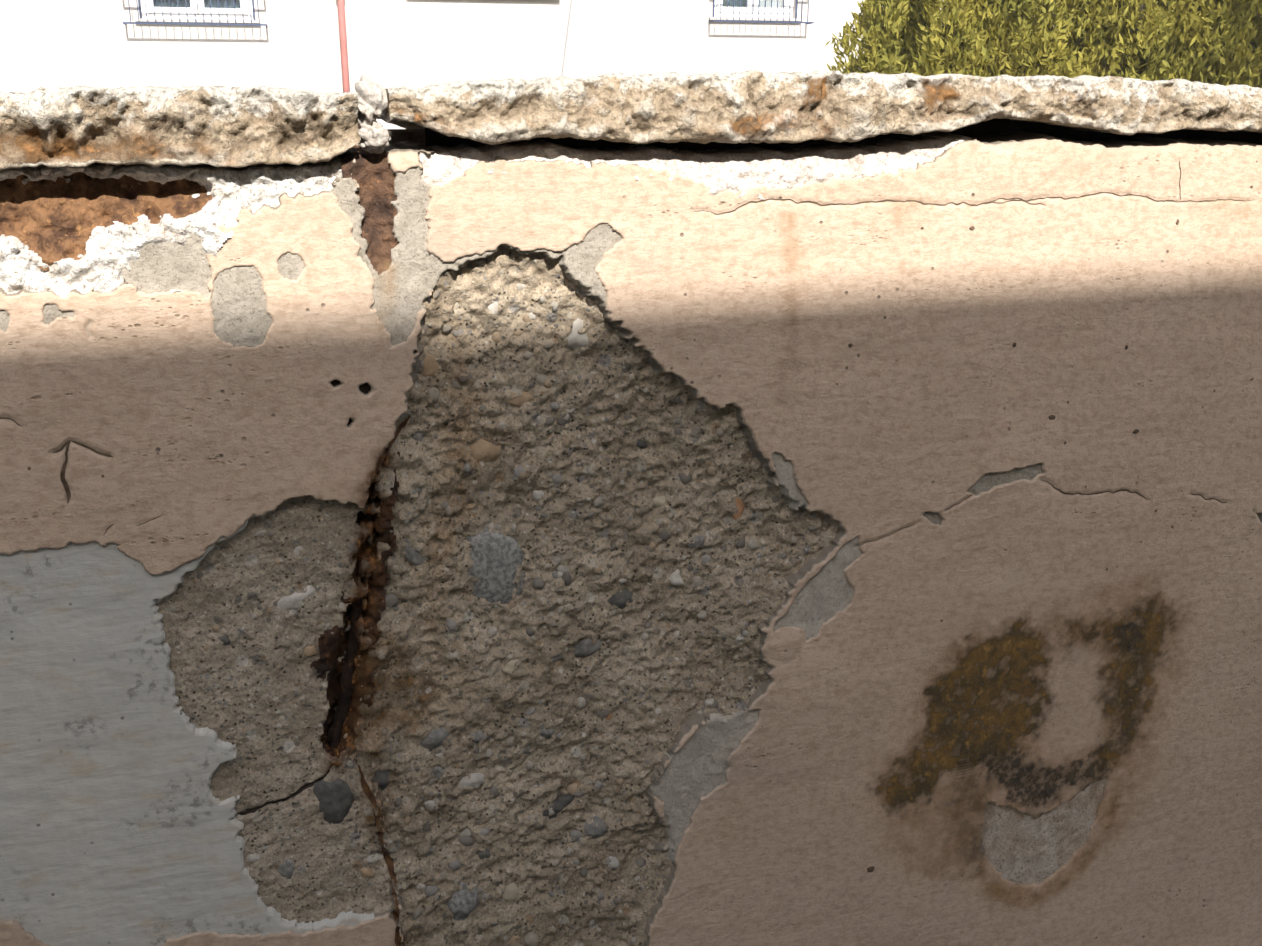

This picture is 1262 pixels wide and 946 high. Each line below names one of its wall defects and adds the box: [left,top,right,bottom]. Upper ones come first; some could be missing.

crack [337,125,399,275]
crack [425,118,1262,215]
crack [53,440,113,503]
spalling [0,132,972,946]
crack [1042,480,1150,500]
crack [232,416,411,946]
corrosion [327,603,435,758]